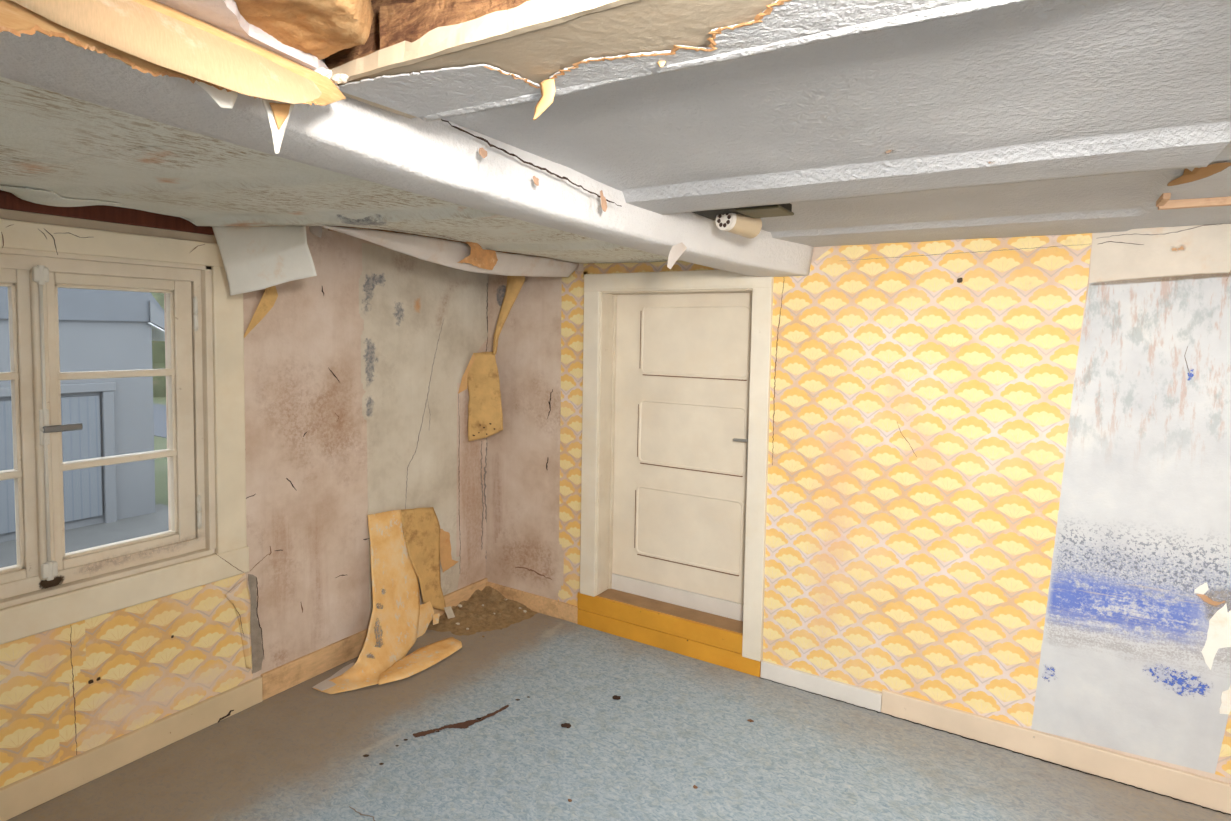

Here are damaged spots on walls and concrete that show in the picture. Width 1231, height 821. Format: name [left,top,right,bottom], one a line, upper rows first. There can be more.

peeling [1194,582,1231,670]
peeling [1220,684,1231,714]